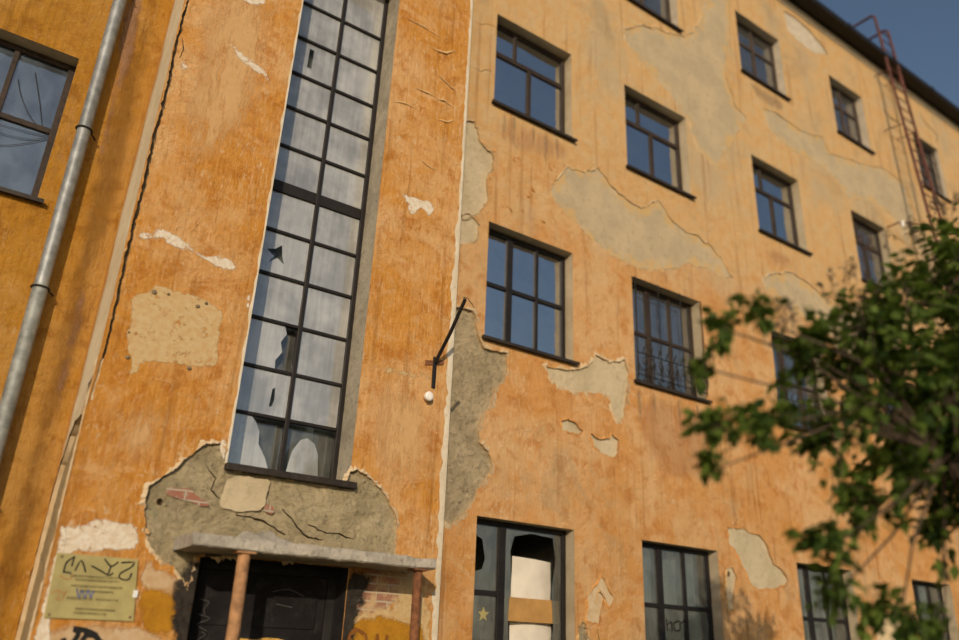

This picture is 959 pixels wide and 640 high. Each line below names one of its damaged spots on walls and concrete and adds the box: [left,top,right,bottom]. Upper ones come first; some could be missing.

peeling [624,0,747,169]
crack [93,0,189,398]
peeling [139,229,235,270]
peeling [527,163,733,279]
peeling [125,286,223,374]
flaking render [425,0,509,640]
peeling [762,270,864,353]
flaking render [542,351,631,459]
flaking render [15,357,408,640]
crack [206,466,354,540]
flaking render [725,526,788,610]
peeling [877,619,900,640]